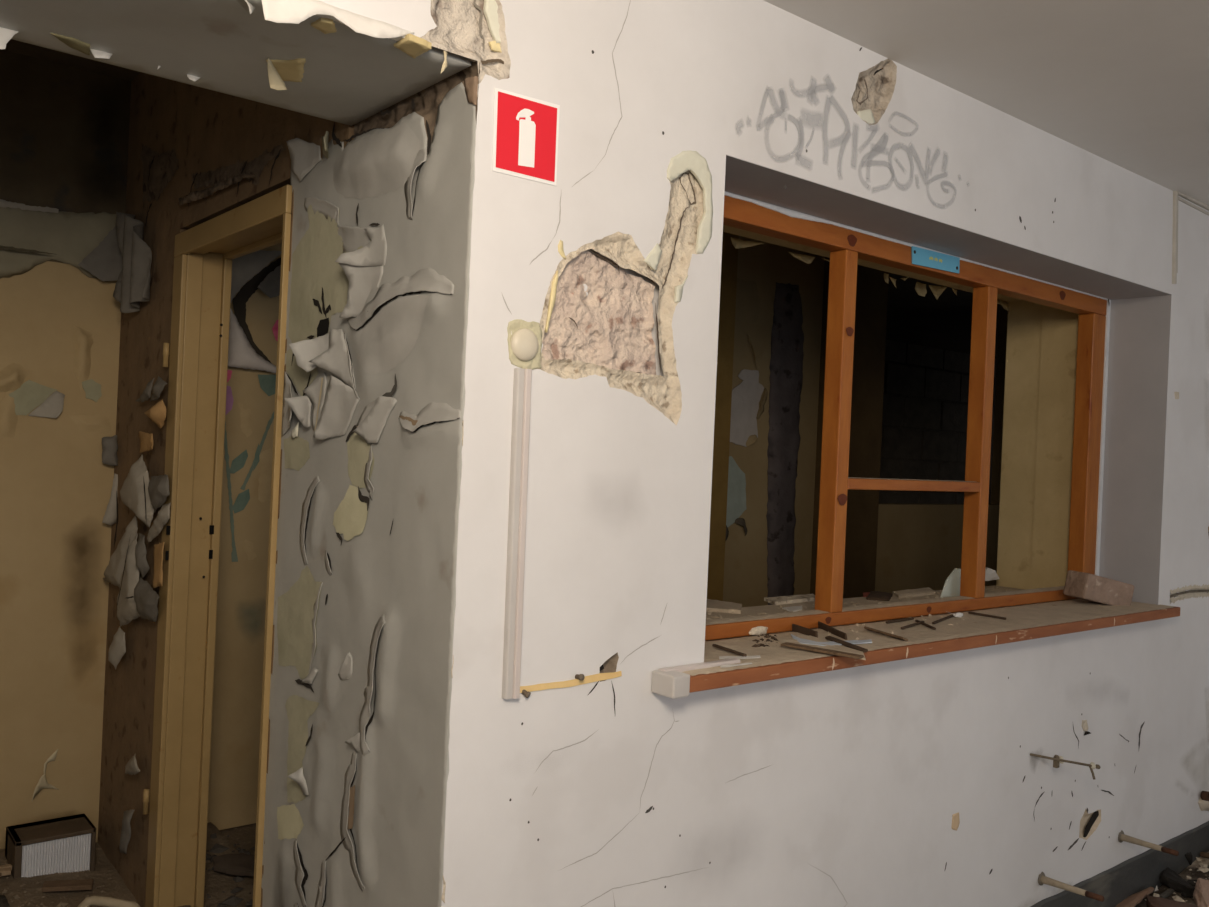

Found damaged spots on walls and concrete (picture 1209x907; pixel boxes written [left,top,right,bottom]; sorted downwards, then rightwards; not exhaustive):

peeling [0,27,18,50]
flaking render [237,0,511,181]
crack [530,0,631,264]
flaking render [851,59,897,125]
peeling [0,199,152,313]
flaking render [507,151,713,425]
peeling [281,197,418,544]
peeling [102,376,170,670]
crack [621,605,667,663]
crack [533,730,598,794]
crack [564,714,678,868]
crack [581,867,709,907]